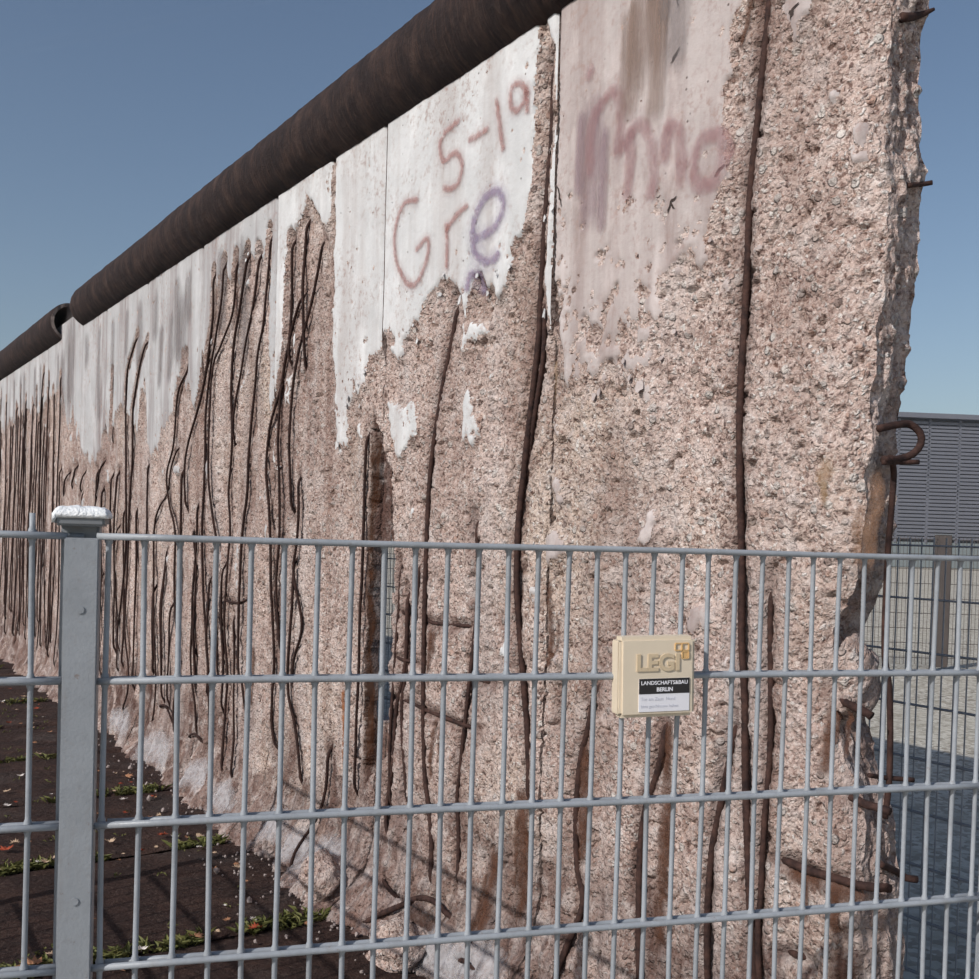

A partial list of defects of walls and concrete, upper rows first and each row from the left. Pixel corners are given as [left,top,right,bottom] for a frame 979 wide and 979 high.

corrosion [740,0,753,44]
spalling [0,0,935,814]
corrosion [363,441,382,767]
corrosion [820,705,854,772]
spalling [212,793,893,936]
spalling [416,911,866,979]